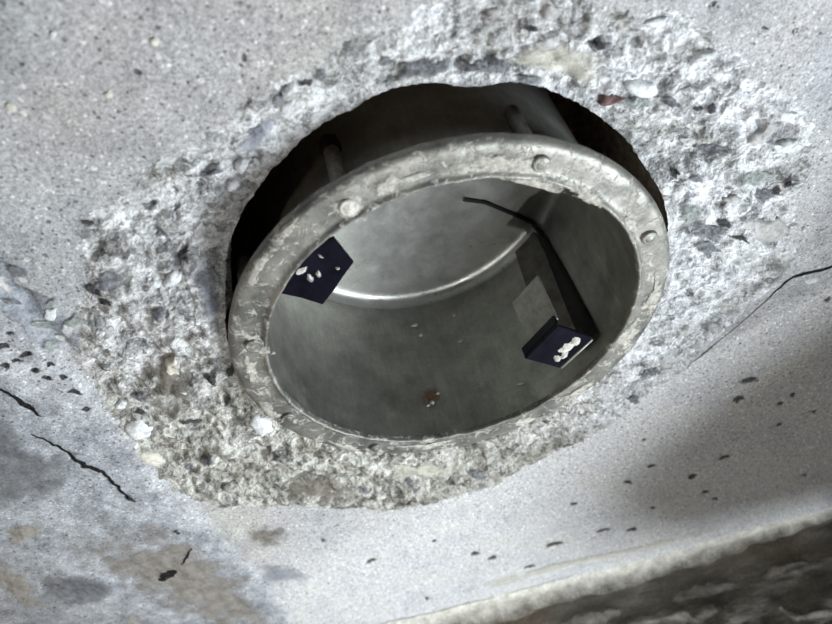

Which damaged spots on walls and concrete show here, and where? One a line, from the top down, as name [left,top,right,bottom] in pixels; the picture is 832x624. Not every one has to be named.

spalling [1,351,32,370]
peeling [0,258,86,352]
spalling [31,362,68,381]
spalling [73,0,816,512]
crack [688,266,832,368]
crack [0,389,136,503]